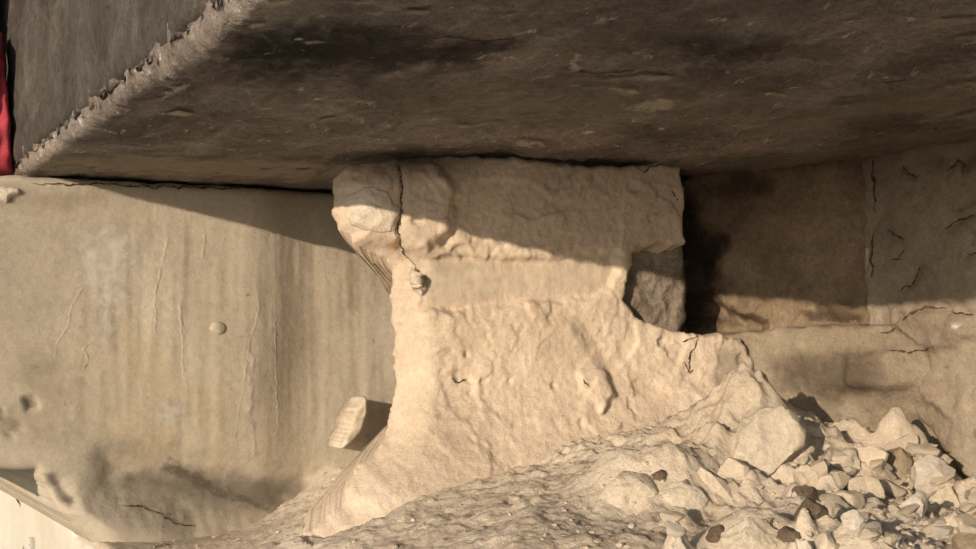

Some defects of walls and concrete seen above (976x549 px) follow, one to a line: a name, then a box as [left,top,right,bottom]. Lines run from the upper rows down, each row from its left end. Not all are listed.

crack [395,160,416,268]
crack [869,159,920,292]
leakage [54,228,141,368]
spalling [303,139,753,538]
crack [880,306,973,354]
crack [124,505,196,548]
leakage [144,472,294,506]